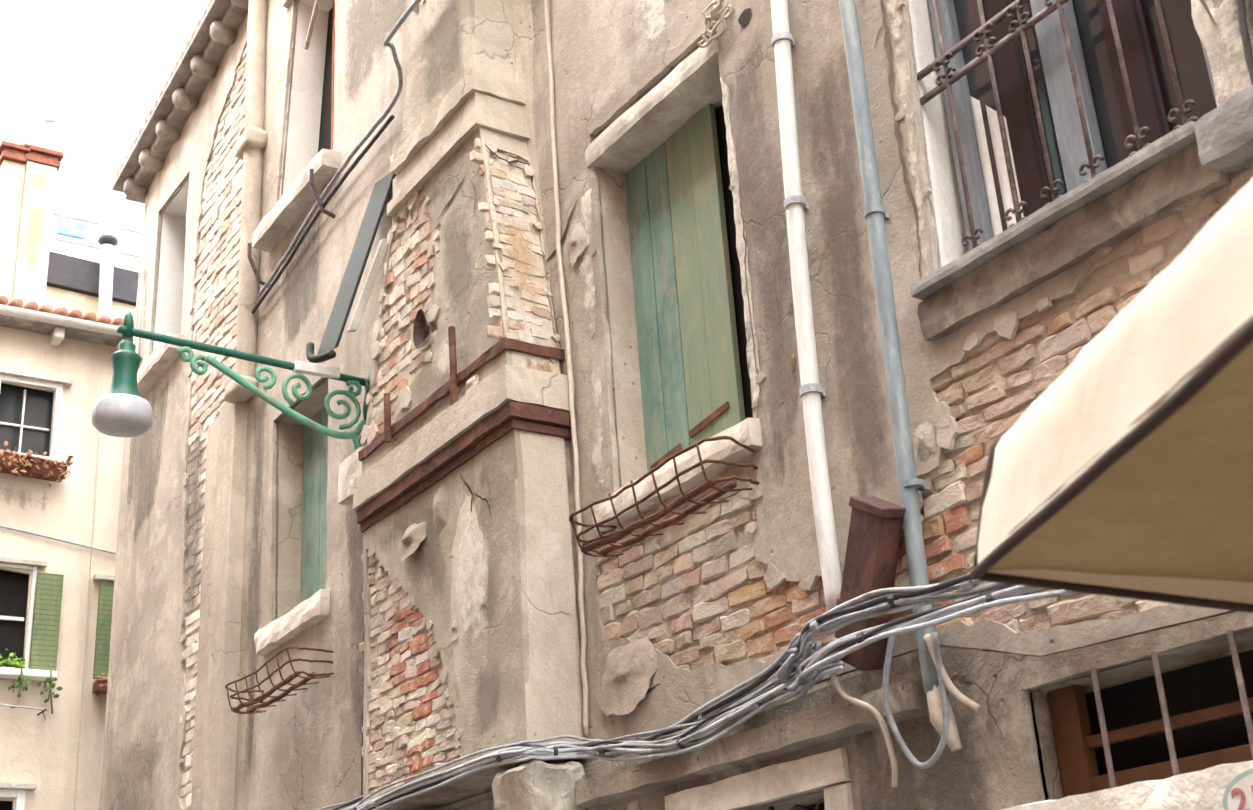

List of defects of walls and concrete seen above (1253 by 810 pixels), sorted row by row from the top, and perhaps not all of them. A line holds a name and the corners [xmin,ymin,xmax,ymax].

crack [1199,0,1232,64]
spalling [178,47,247,810]
spalling [361,191,441,445]
peeling [469,138,560,363]
spalling [359,545,462,795]
spalling [596,455,835,672]
spalling [890,531,914,619]